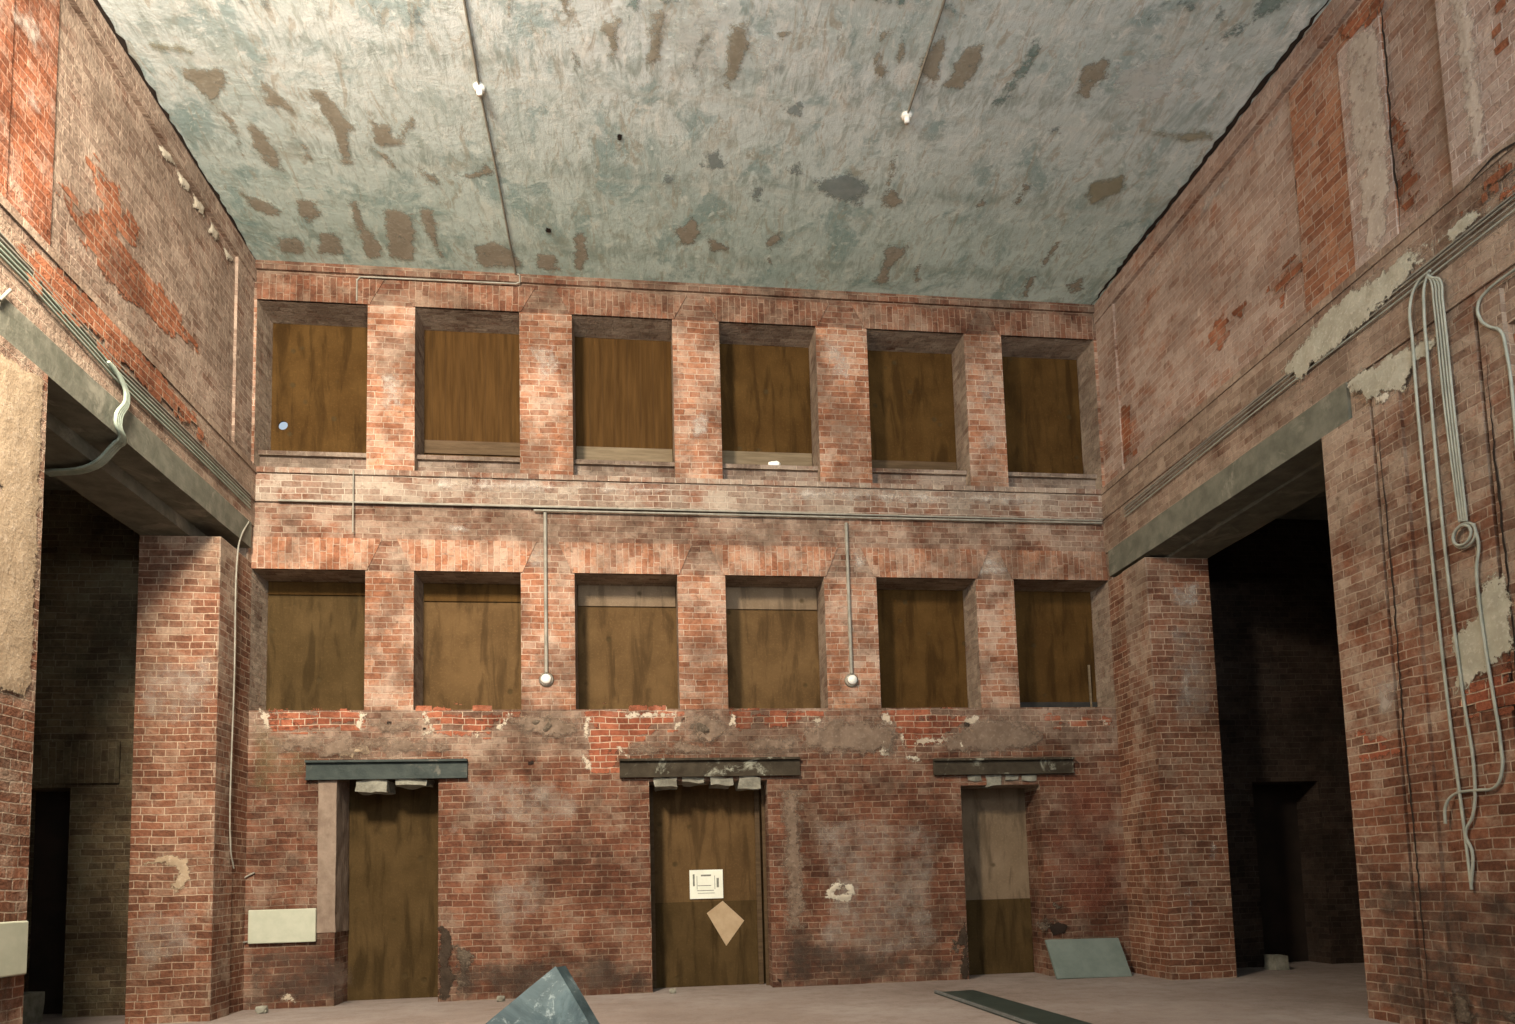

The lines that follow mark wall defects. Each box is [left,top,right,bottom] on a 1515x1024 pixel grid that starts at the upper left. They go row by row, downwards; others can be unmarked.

peeling [724,23,750,88]
peeling [874,31,905,76]
peeling [920,38,983,88]
peeling [242,194,344,254]
peeling [350,201,444,260]
peeling [474,233,589,270]
flaking render [7,153,209,448]
flaking render [416,703,825,774]